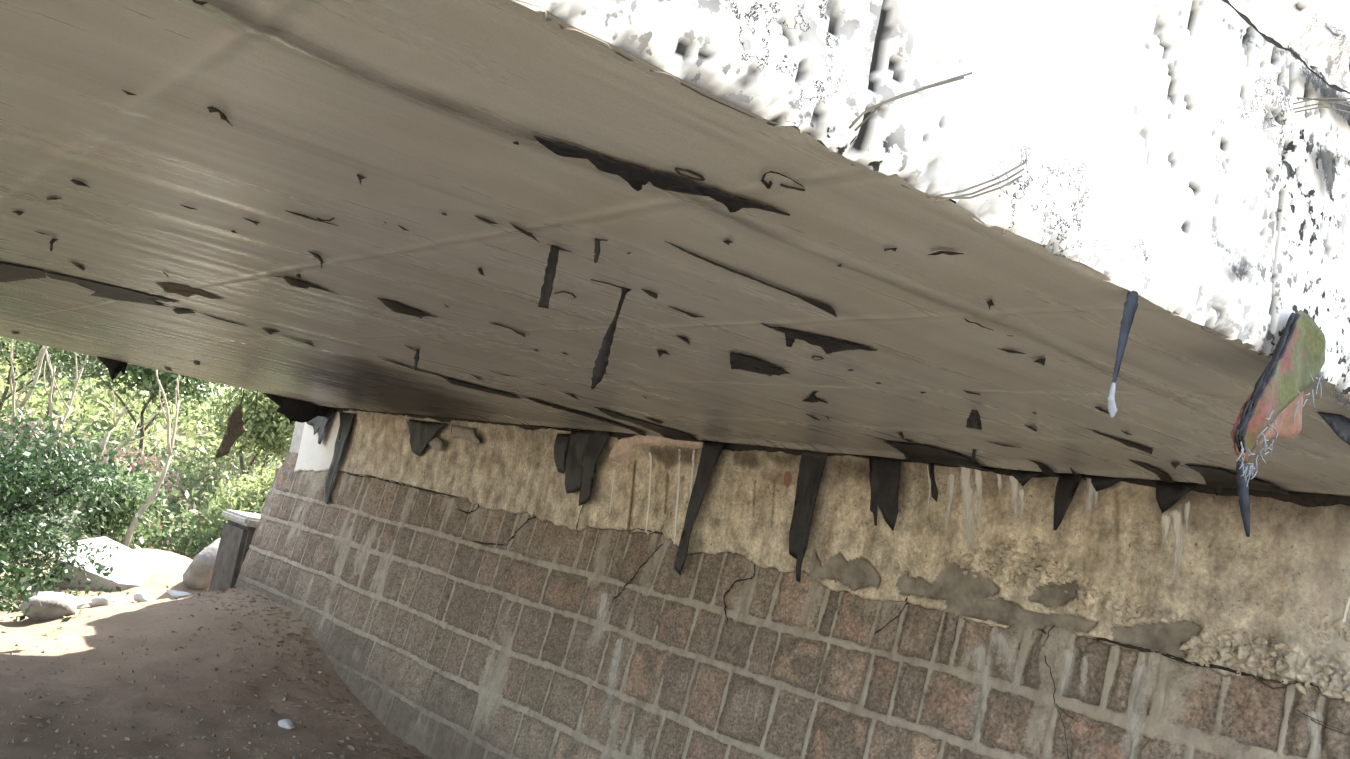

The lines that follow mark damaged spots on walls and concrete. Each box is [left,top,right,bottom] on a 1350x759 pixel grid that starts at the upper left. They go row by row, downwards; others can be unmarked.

crack [612,472,664,602]
damp [946,467,1024,543]
damp [1086,478,1098,510]
damp [1162,501,1190,570]
spalling [808,536,1350,702]
crack [1089,636,1253,676]